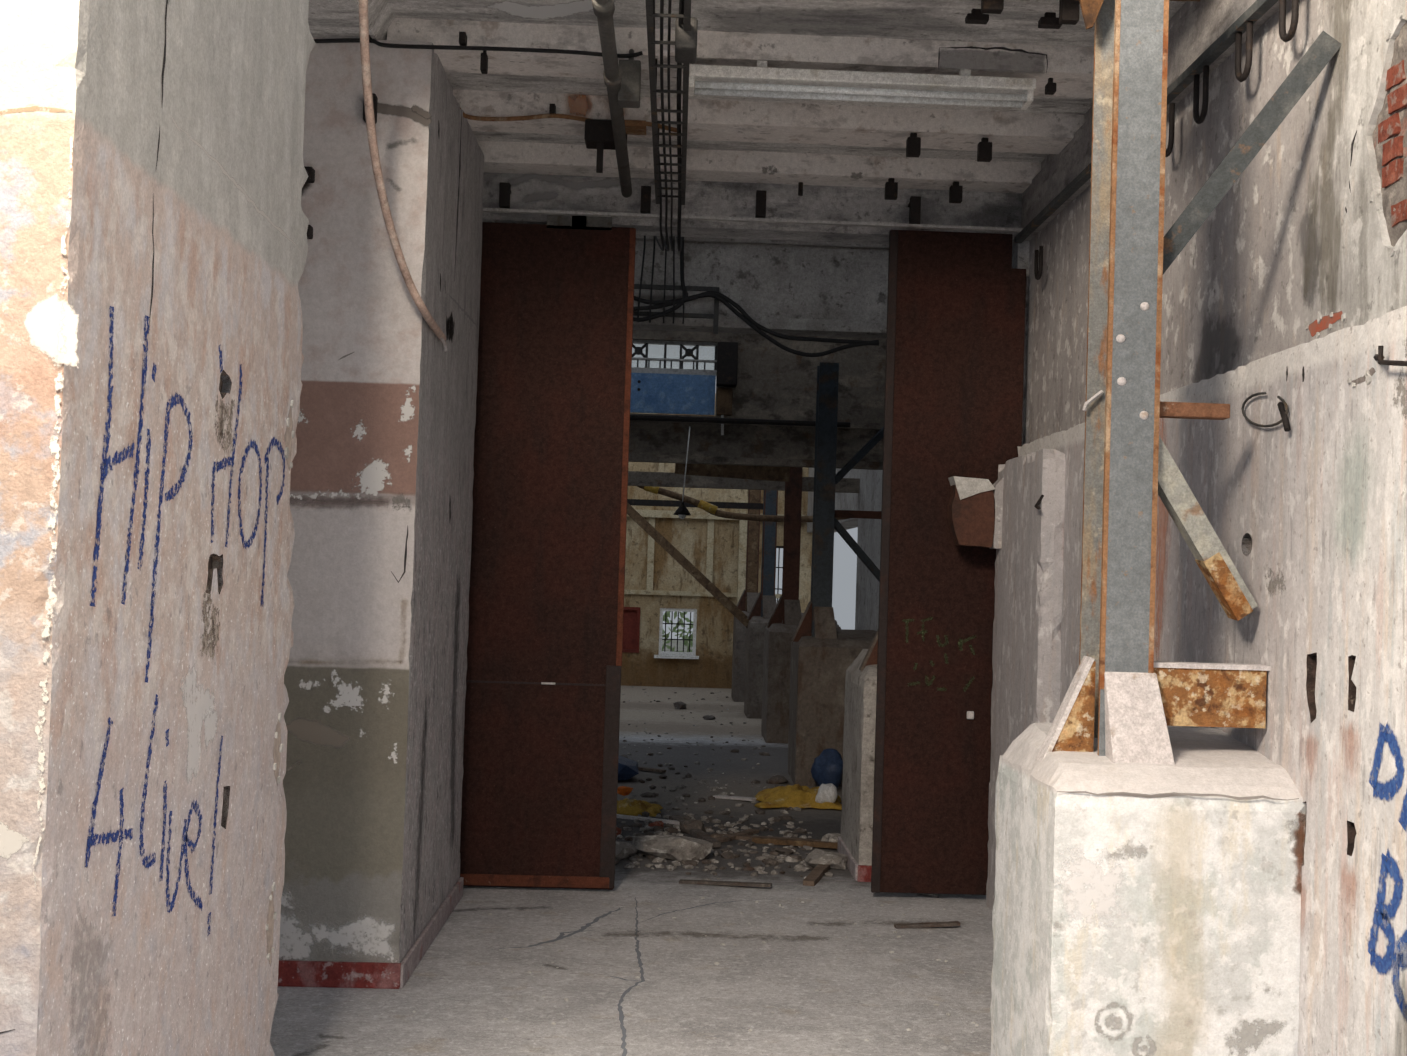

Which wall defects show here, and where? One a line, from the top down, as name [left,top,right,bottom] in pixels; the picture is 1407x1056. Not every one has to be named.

spalling [1345,13,1407,257]
peeling [350,422,367,440]
peeling [398,385,416,422]
peeling [290,458,410,508]
peeling [0,187,79,888]
peeling [299,669,395,737]
crack [500,897,768,1056]